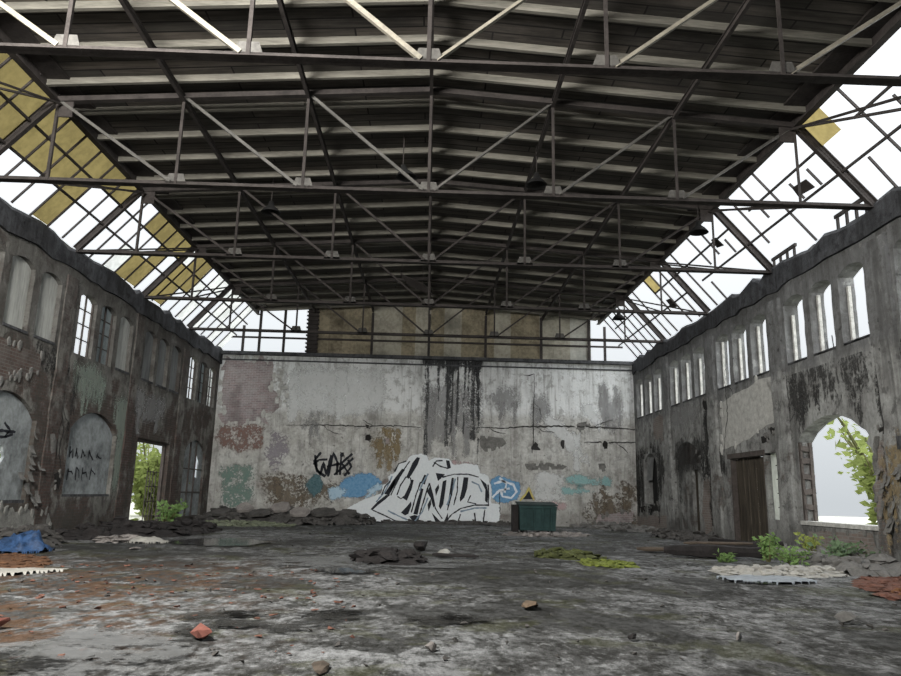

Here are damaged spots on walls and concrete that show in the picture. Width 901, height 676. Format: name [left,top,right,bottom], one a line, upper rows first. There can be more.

flaking render [0,431,62,529]
damp [422,360,519,465]
damp [530,396,589,472]
damp [701,409,720,527]
damp [786,352,884,434]